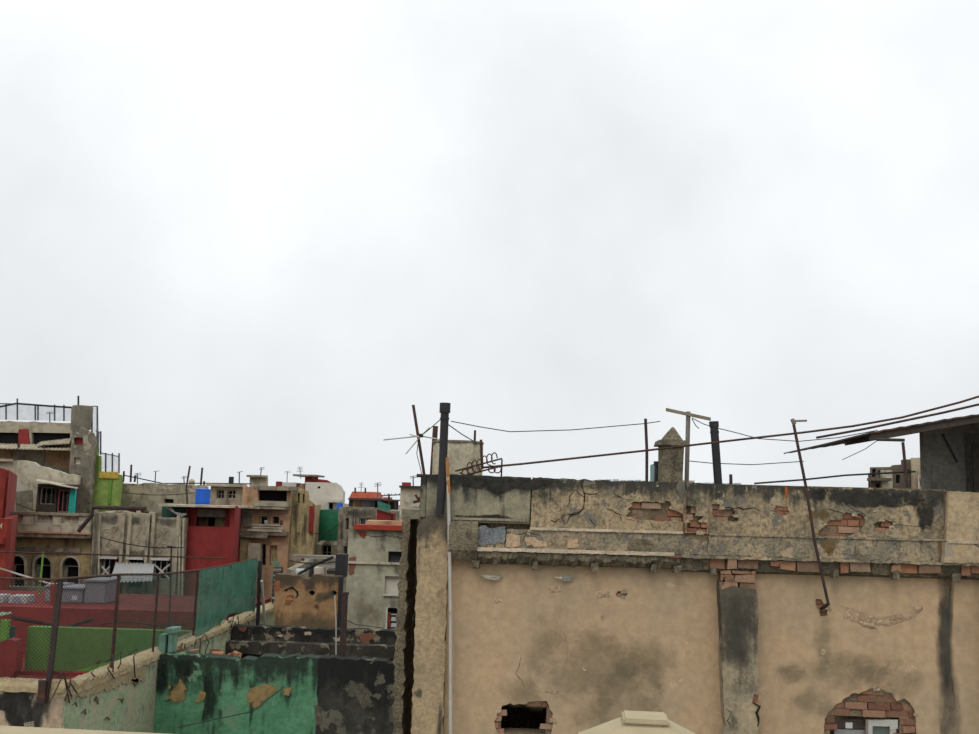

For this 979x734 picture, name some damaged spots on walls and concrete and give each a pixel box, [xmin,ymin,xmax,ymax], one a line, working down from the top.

crack [504,481,630,545]
flaking render [625,501,743,535]
flaking render [818,513,895,539]
damp [156,661,190,693]
flaking render [167,679,206,703]
damp [202,673,217,720]
flaking render [246,684,292,708]
spalling [495,689,557,734]
flaking render [823,686,919,734]